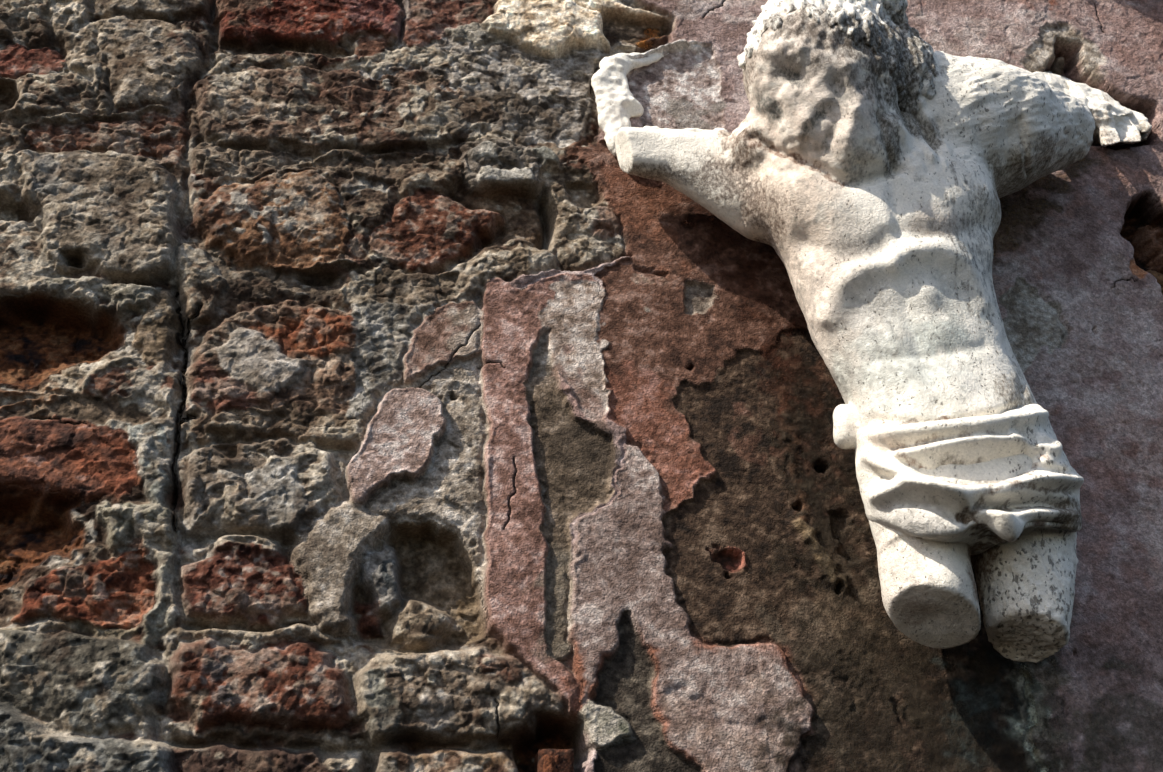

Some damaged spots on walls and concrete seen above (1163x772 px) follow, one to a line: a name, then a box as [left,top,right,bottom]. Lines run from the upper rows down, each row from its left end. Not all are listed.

crack [170,292,202,532]
crack [415,325,505,389]
spalling [168,139,1049,772]